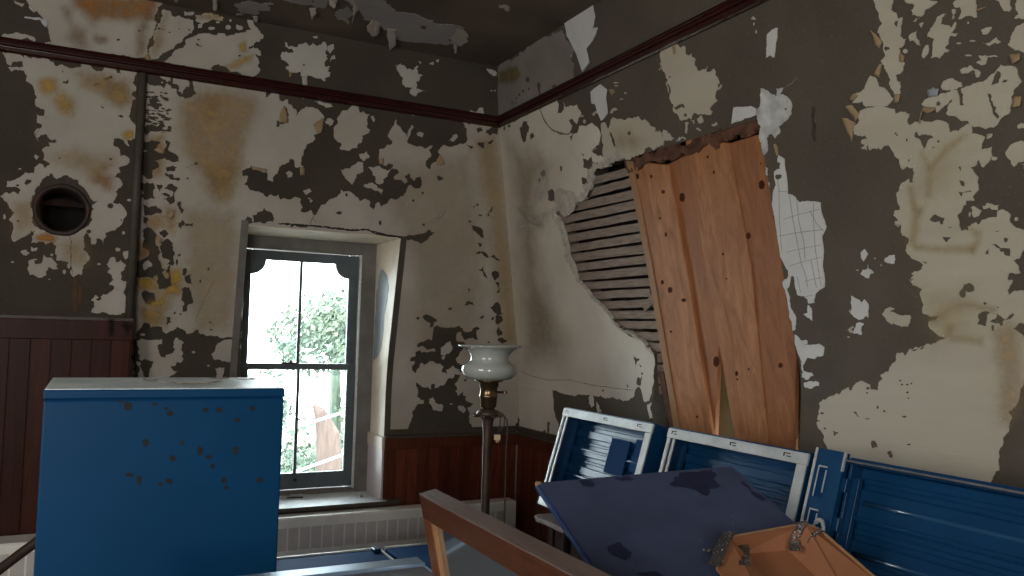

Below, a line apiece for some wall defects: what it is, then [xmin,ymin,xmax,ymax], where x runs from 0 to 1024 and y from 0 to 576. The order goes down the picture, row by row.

peeling [2,0,469,77]
peeling [1,52,256,384]
crack [278,214,435,238]
peeling [242,6,768,435]
peeling [817,0,1024,483]
peeling [782,275,813,331]
peeling [801,362,819,389]